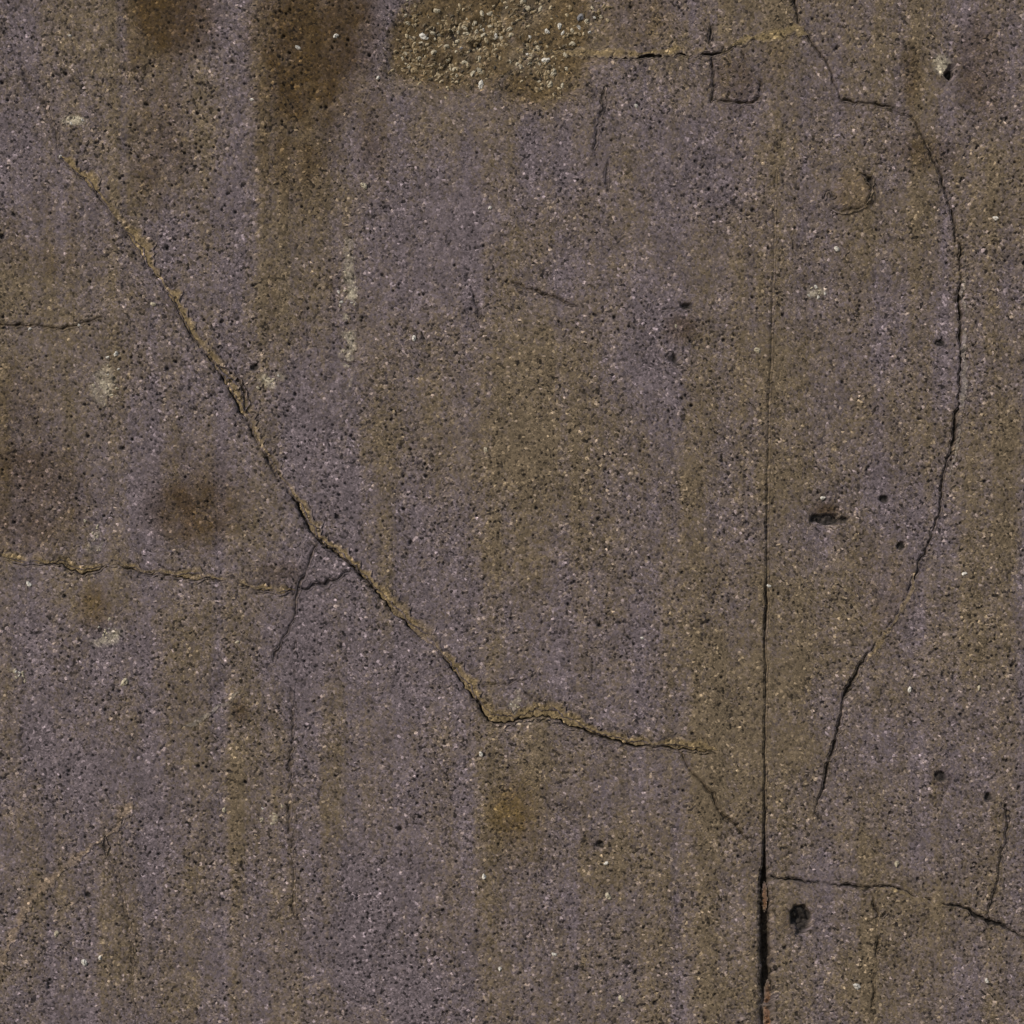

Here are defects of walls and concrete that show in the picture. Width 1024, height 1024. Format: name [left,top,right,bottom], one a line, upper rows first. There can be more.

damp [127,423,266,564]
damp [0,0,400,396]
crack [0,62,749,940]
crack [513,0,969,822]
crack [753,168,1024,1024]